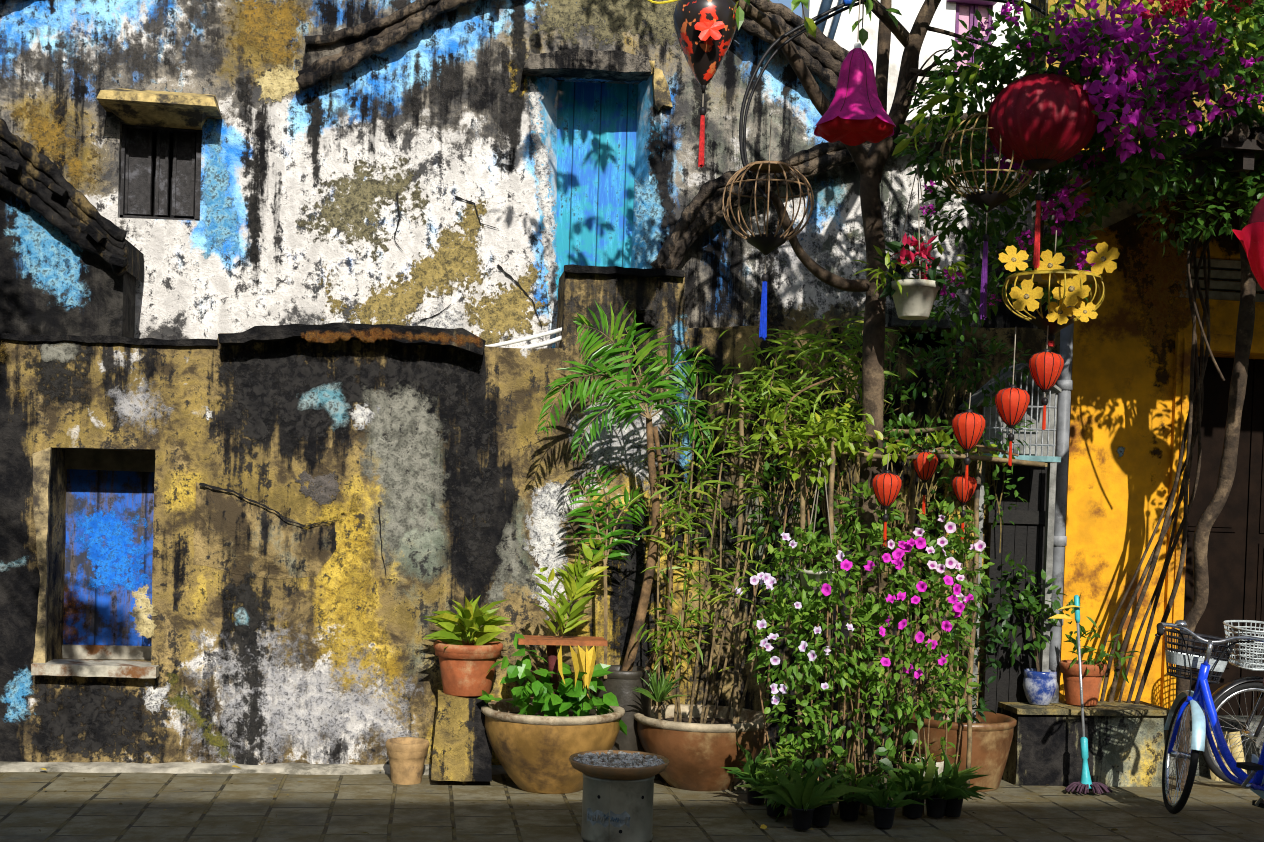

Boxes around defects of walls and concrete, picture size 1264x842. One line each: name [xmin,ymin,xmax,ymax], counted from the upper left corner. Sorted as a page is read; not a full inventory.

leakage [0,0,262,294]
peeling [202,119,241,259]
flaking render [295,66,559,346]
leakage [305,0,562,185]
leakage [215,339,505,583]